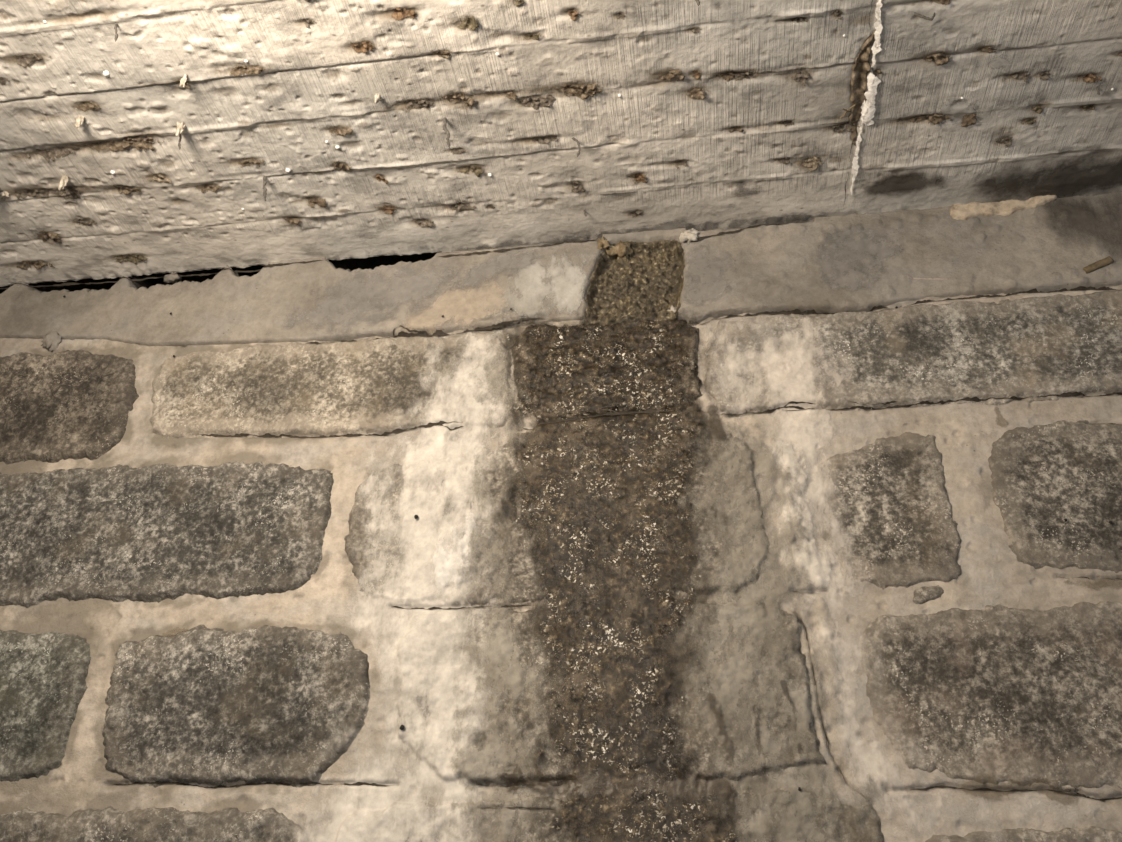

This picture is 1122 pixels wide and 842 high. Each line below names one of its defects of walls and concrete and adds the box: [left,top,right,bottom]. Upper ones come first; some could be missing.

leakage [979,148,1122,255]
crack [0,260,318,289]
leakage [287,214,948,842]